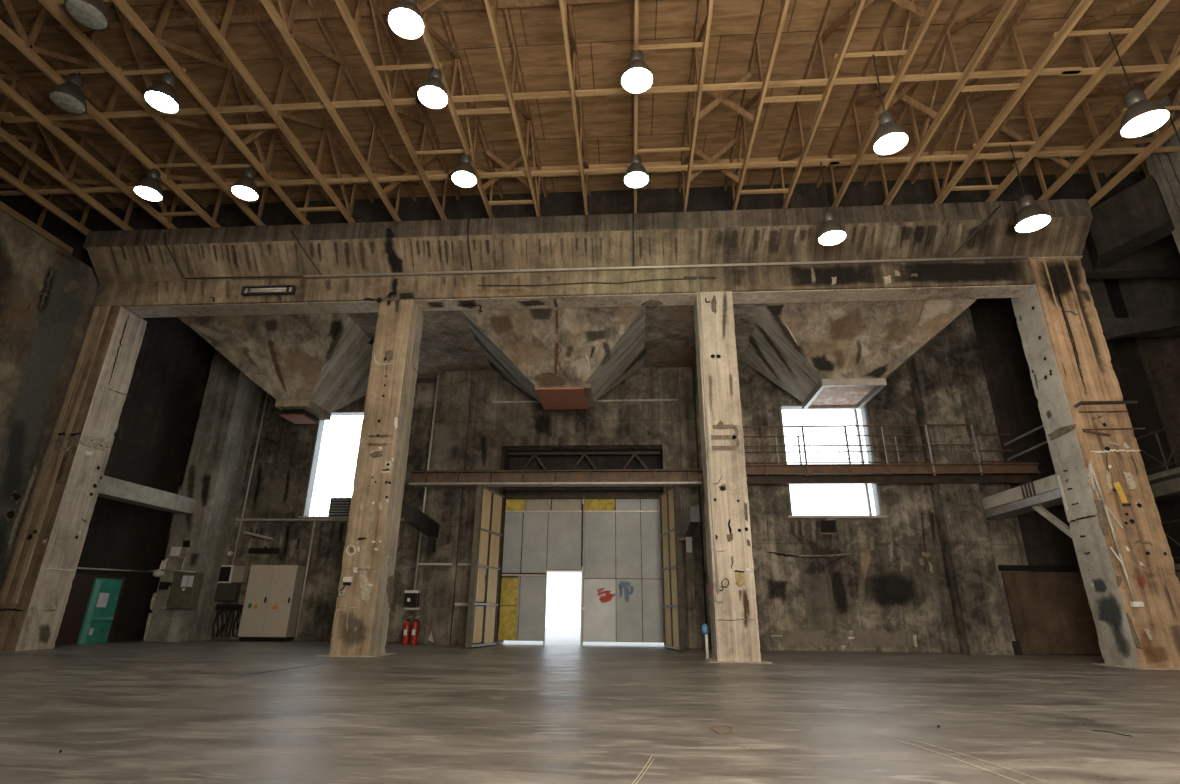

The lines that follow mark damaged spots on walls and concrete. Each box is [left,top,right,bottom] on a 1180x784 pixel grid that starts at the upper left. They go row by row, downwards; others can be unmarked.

damp [1101,623,1128,655]